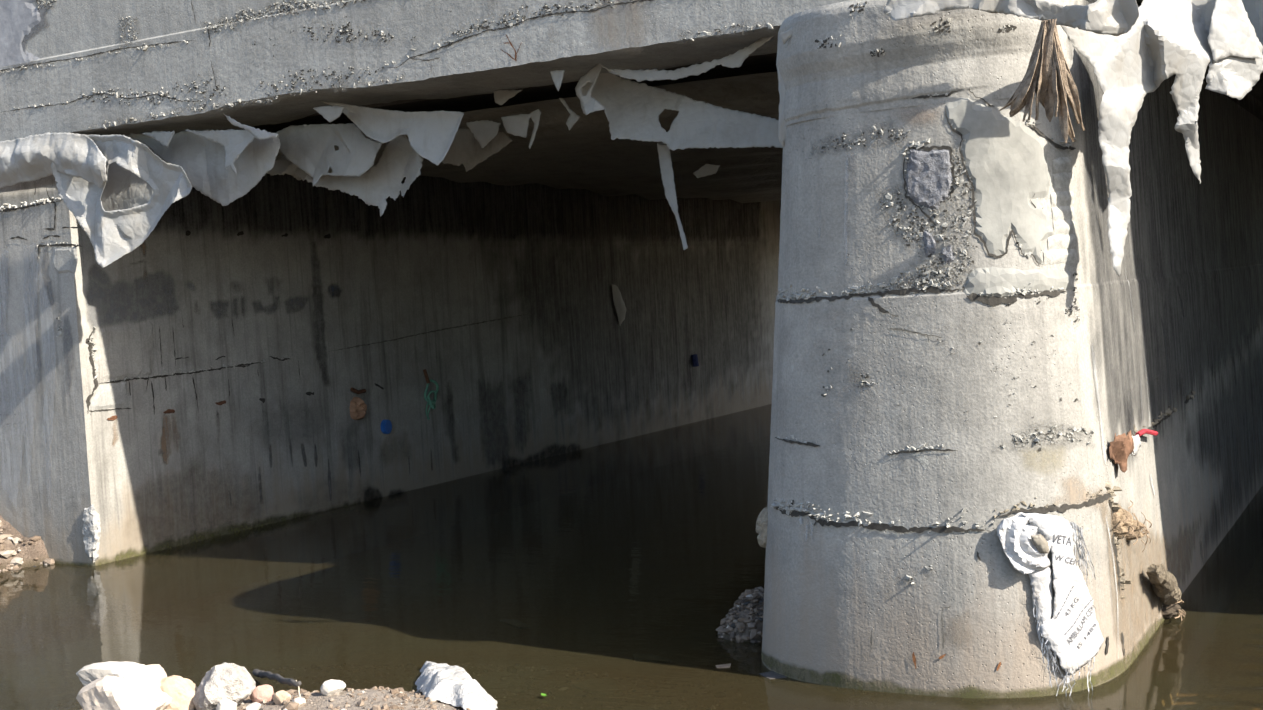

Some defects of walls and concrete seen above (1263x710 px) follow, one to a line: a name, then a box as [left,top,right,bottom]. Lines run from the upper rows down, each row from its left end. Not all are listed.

crack [0,0,217,113]
crack [384,0,652,68]
spalling [932,18,951,34]
crack [1025,120,1077,150]
crack [775,88,1067,342]
leakage [87,265,178,327]
leakage [1080,54,1263,536]
crack [89,319,300,415]
crack [770,486,1114,561]